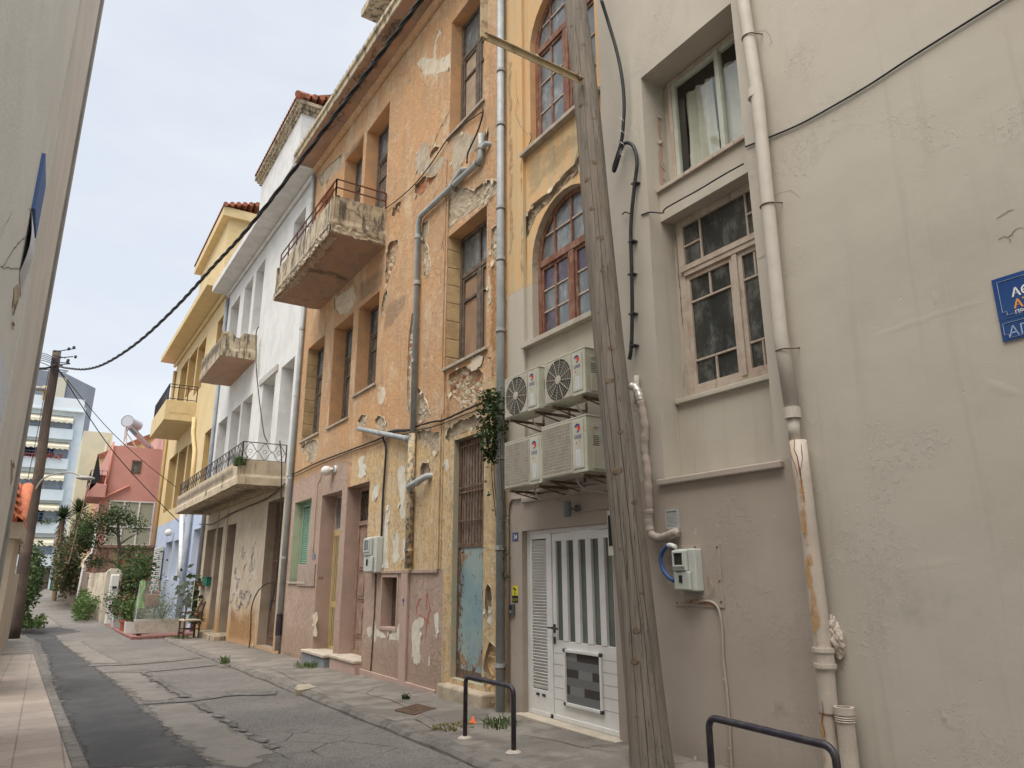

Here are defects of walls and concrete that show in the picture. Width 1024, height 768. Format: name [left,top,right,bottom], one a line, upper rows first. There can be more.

peeling [417,28,451,76]
flaking render [414,127,497,229]
flaking render [525,159,580,239]
spalling [273,219,399,319]
flaking render [406,313,484,485]
peeling [367,613,439,667]
spalling [483,583,493,628]
flaking render [481,641,496,706]